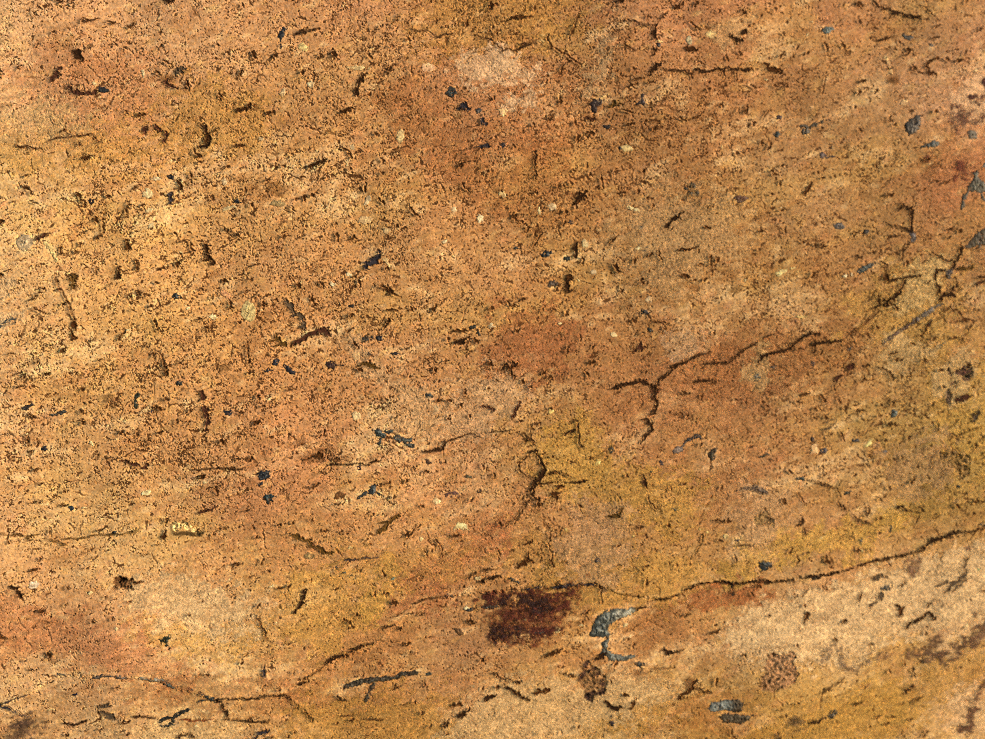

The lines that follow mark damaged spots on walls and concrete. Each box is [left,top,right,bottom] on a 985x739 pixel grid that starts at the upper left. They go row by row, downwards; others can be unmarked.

crack [610,202,973,444]
crack [420,419,588,524]
crack [637,505,985,611]